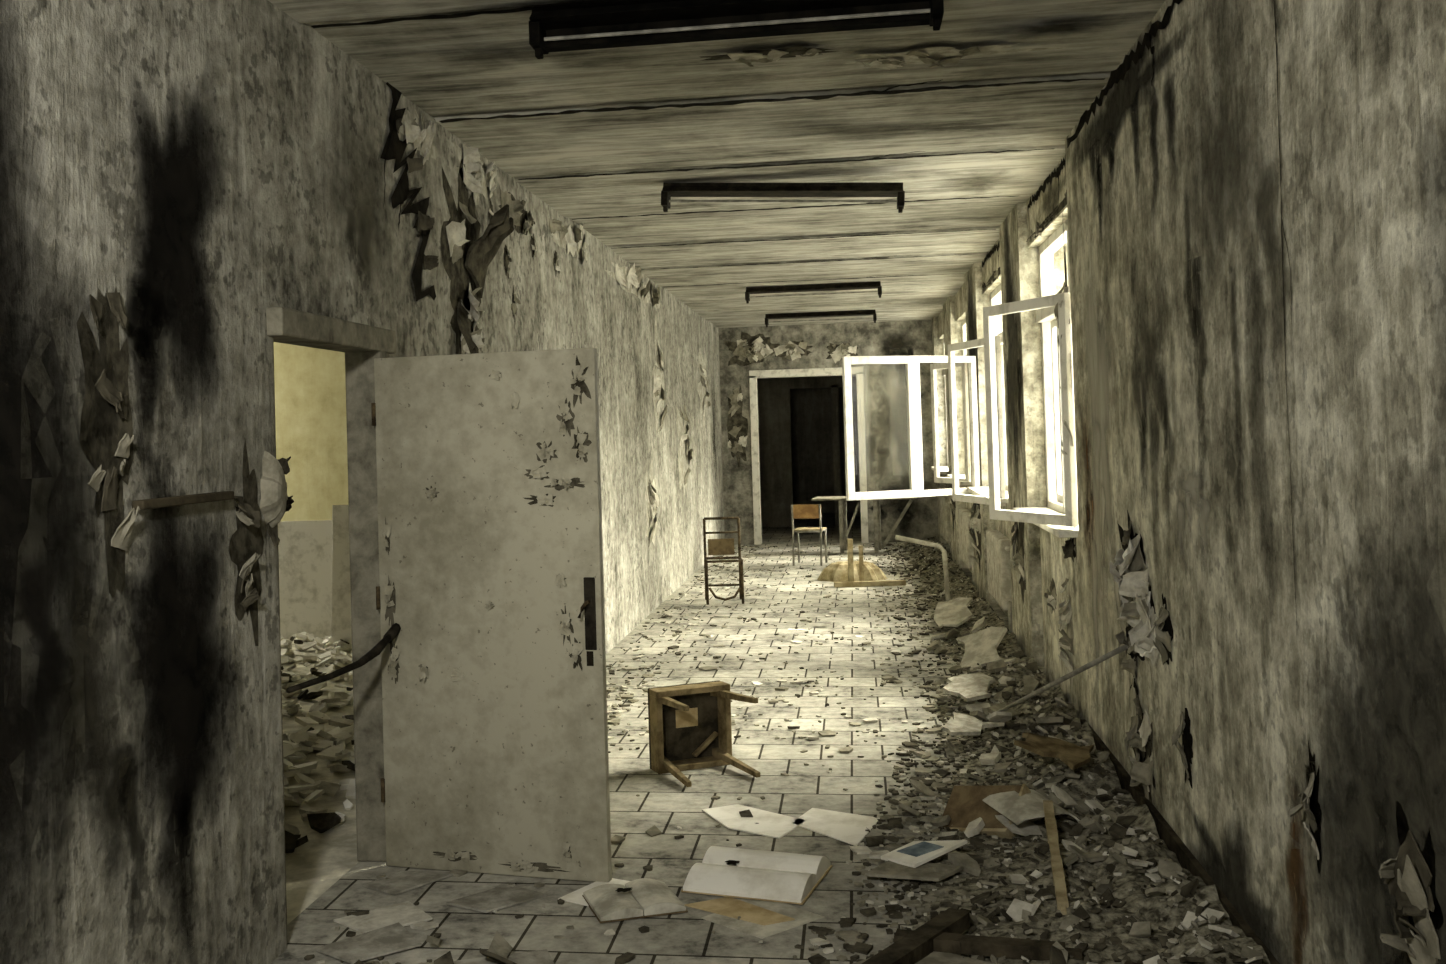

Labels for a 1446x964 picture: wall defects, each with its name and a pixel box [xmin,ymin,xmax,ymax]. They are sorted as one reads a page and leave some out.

water stain [1080,37,1174,225]
water stain [1200,38,1248,219]
spalling [399,109,589,354]
peeling [524,356,592,507]
peeling [605,261,711,495]
peeling [724,332,858,366]
water stain [1134,314,1172,486]
water stain [1231,175,1283,430]
spalling [1109,510,1173,667]
spalling [1171,708,1193,789]
water stain [1313,552,1446,964]
water stain [1193,823,1277,960]